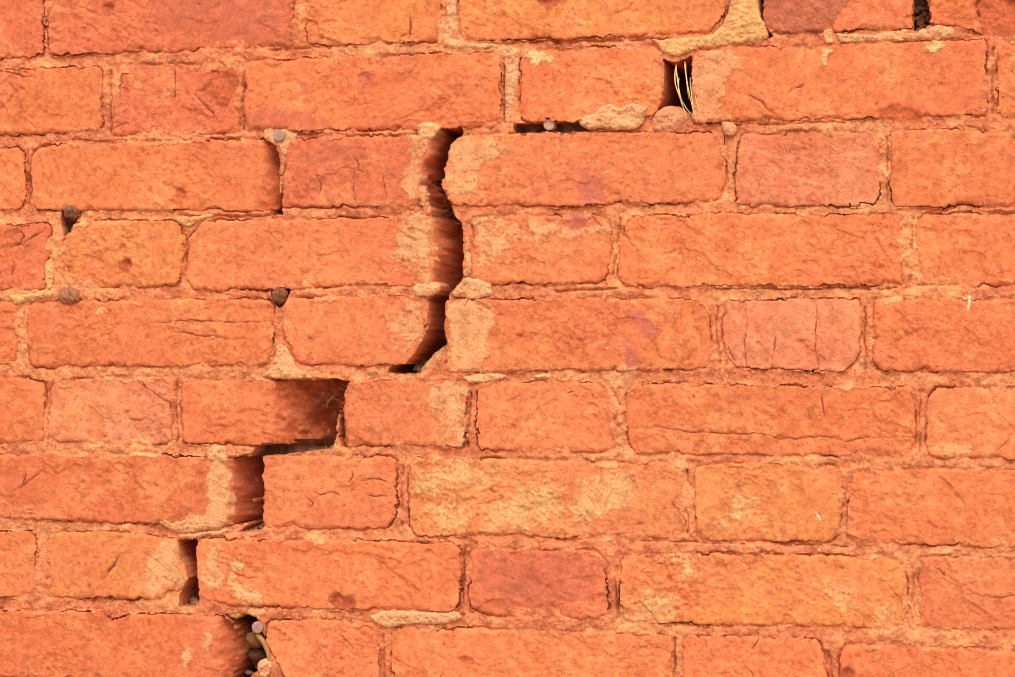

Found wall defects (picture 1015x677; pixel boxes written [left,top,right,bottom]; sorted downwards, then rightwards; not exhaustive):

crack [675,72,693,112]
crack [515,122,591,134]
crack [160,319,256,340]
crack [257,437,336,458]
crack [307,472,388,507]